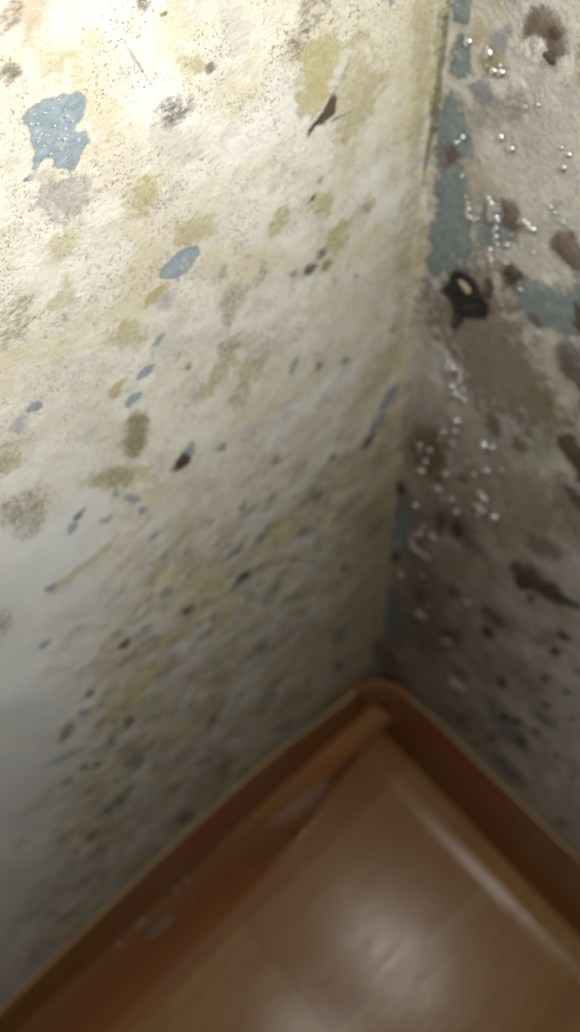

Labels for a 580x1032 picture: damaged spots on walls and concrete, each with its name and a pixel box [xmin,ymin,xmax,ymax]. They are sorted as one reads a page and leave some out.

water stain [0,0,23,31]
water stain [2,62,22,82]
water stain [288,0,341,118]
water stain [161,97,187,128]
water stain [291,220,352,277]
water stain [145,285,174,308]
water stain [0,293,42,344]
water stain [110,378,125,399]
water stain [172,442,195,471]
water stain [69,508,85,533]